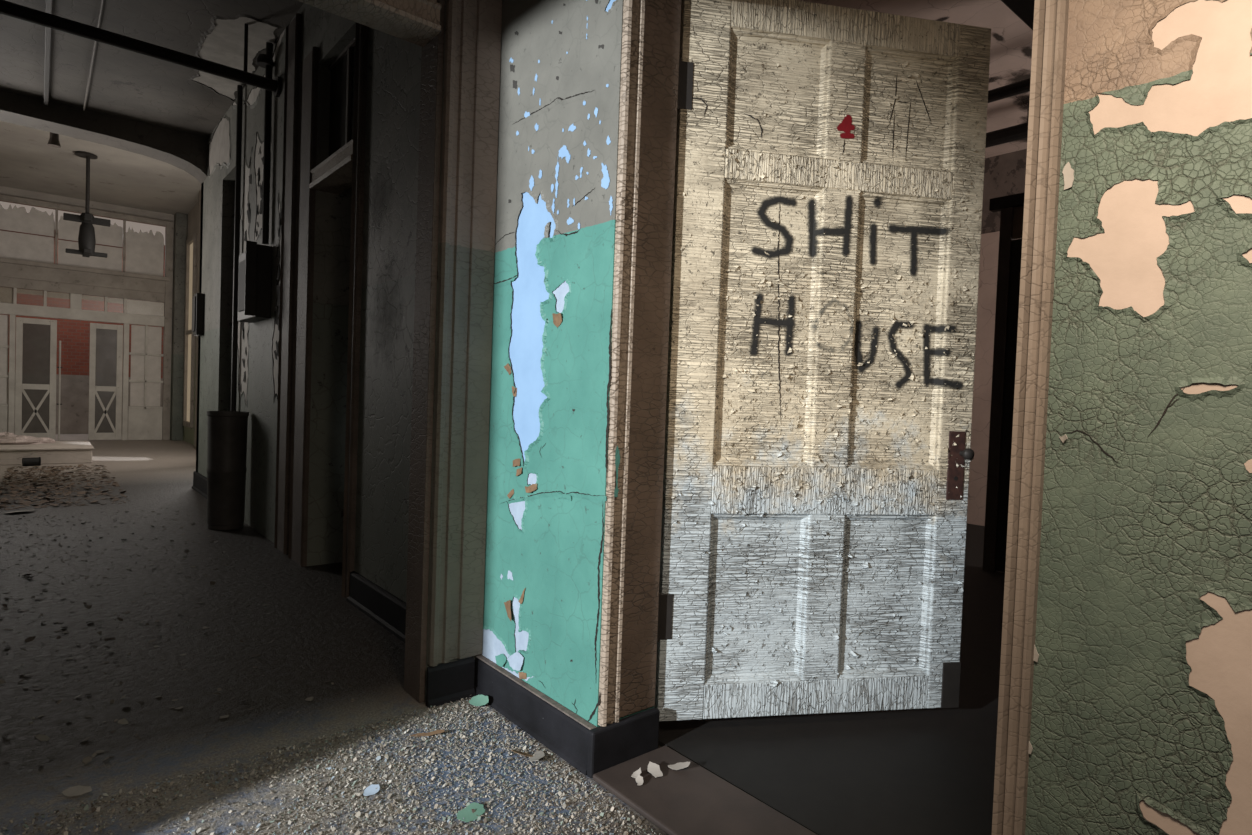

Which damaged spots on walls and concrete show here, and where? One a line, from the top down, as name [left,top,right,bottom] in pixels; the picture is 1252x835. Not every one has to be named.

peeling [509,57,541,131]
crack [512,91,595,129]
peeling [1062,162,1074,190]
peeling [1084,0,1252,142]
peeling [504,101,613,533]
peeling [1063,173,1252,323]
crack [499,309,612,721]
peeling [481,571,533,681]
peeling [469,695,489,706]
peeling [1133,585,1252,835]